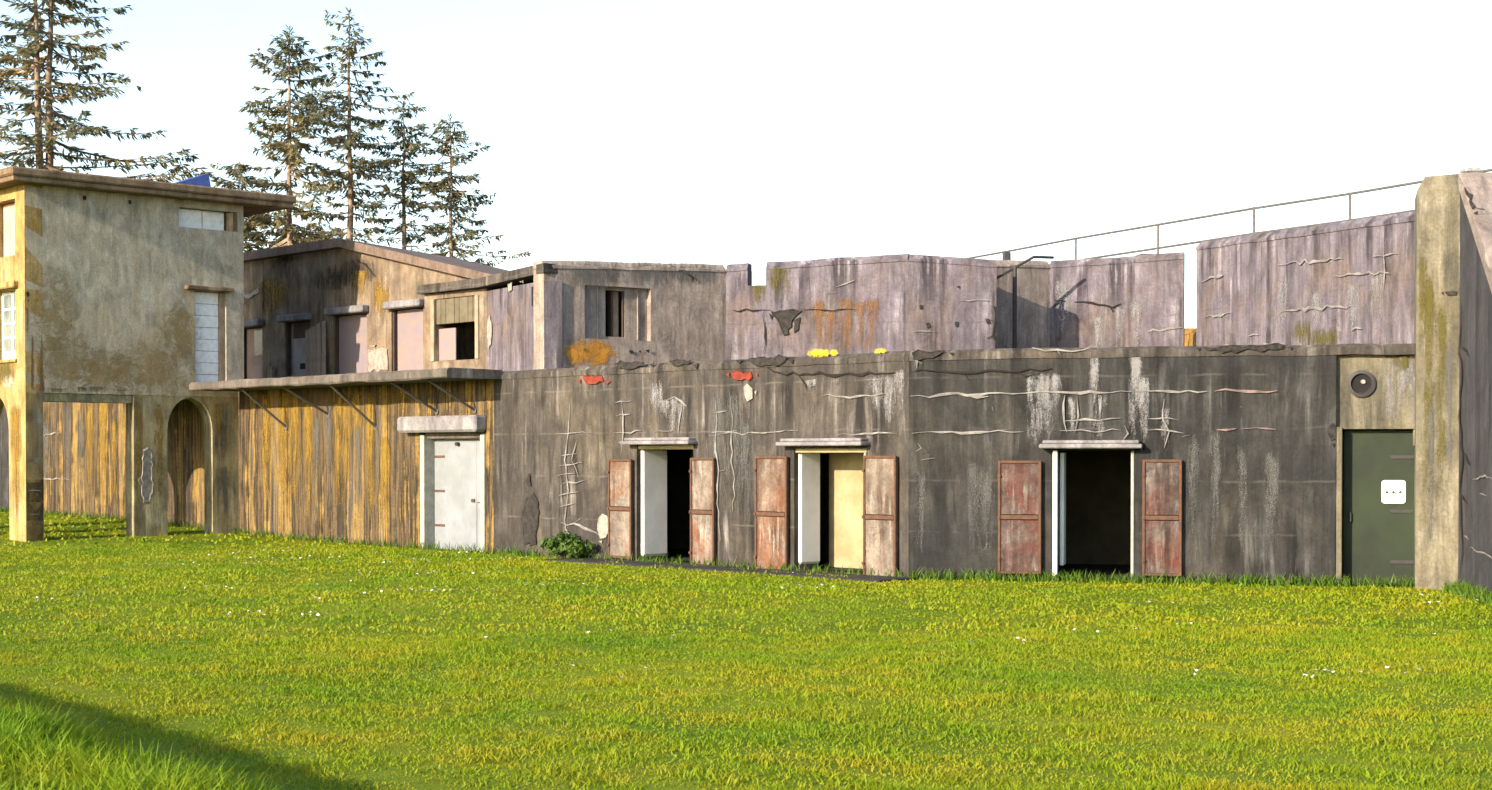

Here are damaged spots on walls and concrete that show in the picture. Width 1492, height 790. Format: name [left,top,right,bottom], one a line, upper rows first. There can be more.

damp [1027,374,1075,428]